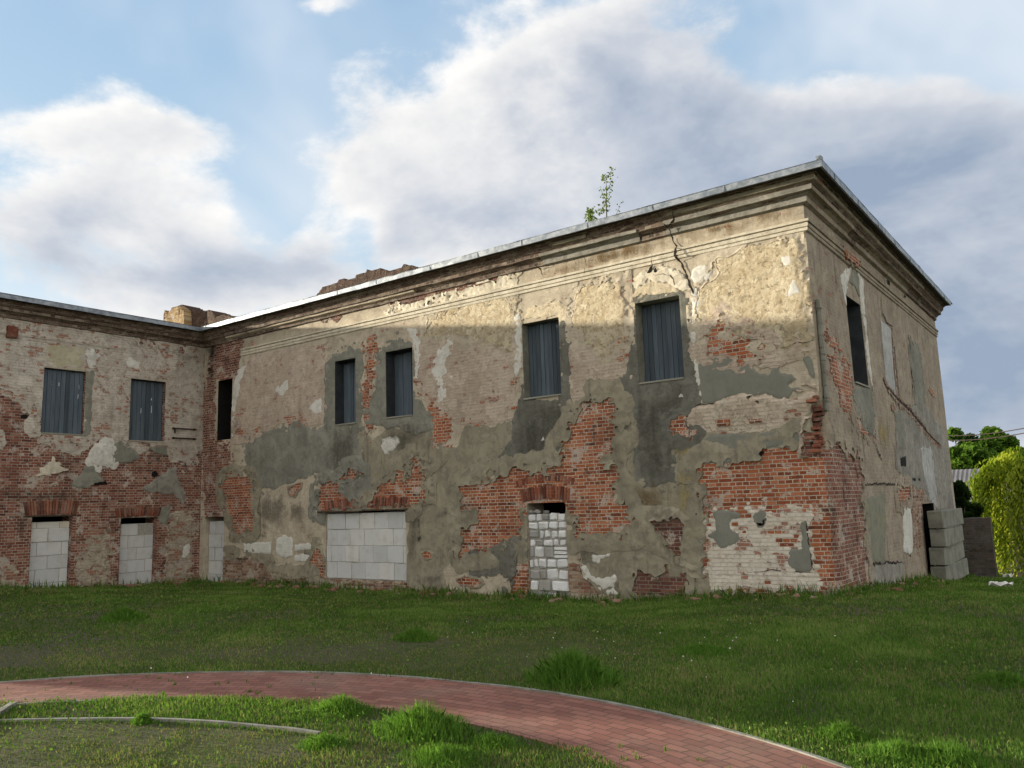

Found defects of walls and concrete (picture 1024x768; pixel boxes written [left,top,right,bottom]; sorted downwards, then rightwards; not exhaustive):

flaking render [0,231,876,600]
crack [651,211,694,294]